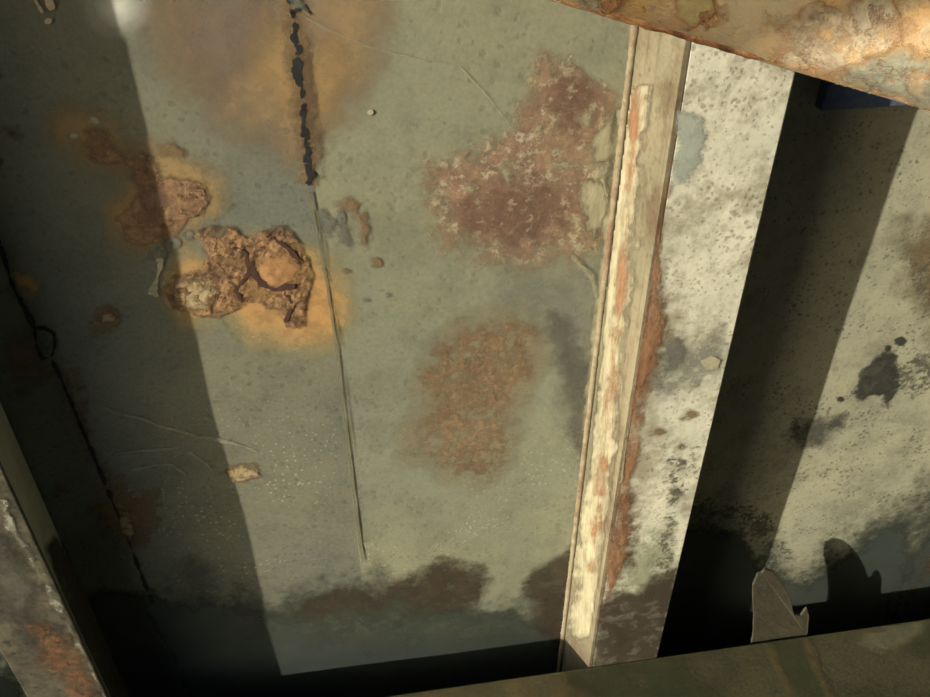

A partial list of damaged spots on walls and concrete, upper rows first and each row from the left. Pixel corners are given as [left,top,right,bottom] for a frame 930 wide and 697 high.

corrosion [157,0,385,164]
crack [281,0,321,186]
corrosion [550,0,930,112]
corrosion [106,144,350,348]
corrosion [903,232,930,307]
crack [0,240,155,604]
peeling [225,464,260,482]
corrosion [605,224,668,600]
corrosion [895,354,930,392]
damp [47,539,570,697]
damp [592,447,930,667]